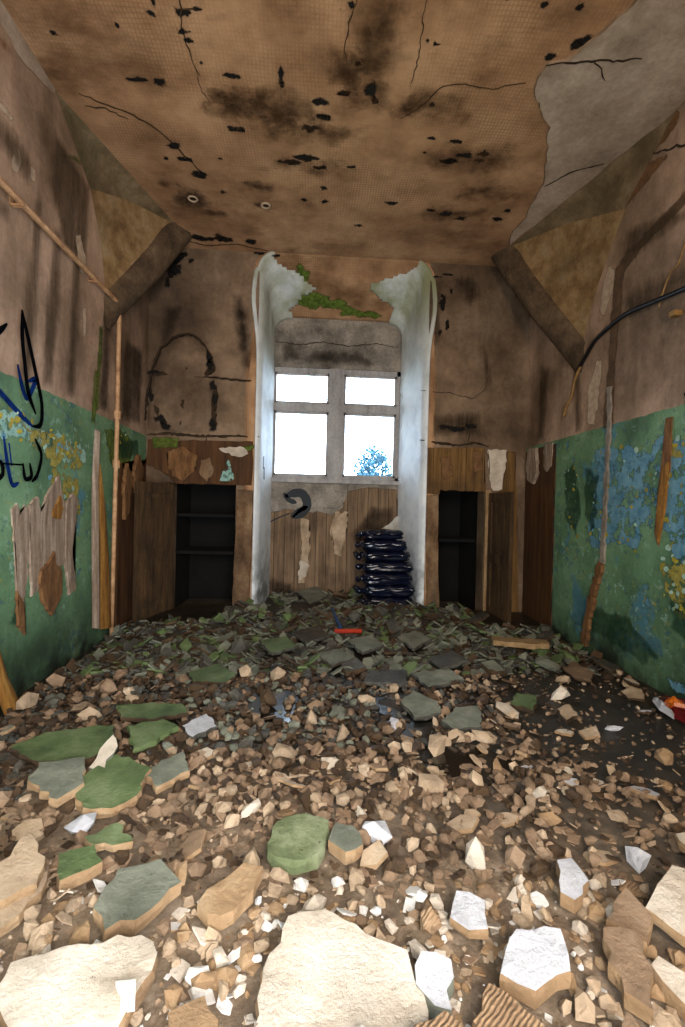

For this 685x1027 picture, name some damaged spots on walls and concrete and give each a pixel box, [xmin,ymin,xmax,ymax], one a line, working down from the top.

crack [78,93,200,171]
water stain [164,142,207,179]
water stain [175,6,202,43]
crack [179,0,210,102]
water stain [217,66,336,138]
water stain [277,154,329,203]
crack [344,0,357,70]
water stain [338,1,396,104]
crack [400,0,524,119]
crack [546,58,642,81]
peeling [509,0,685,245]
spalling [473,449,507,491]